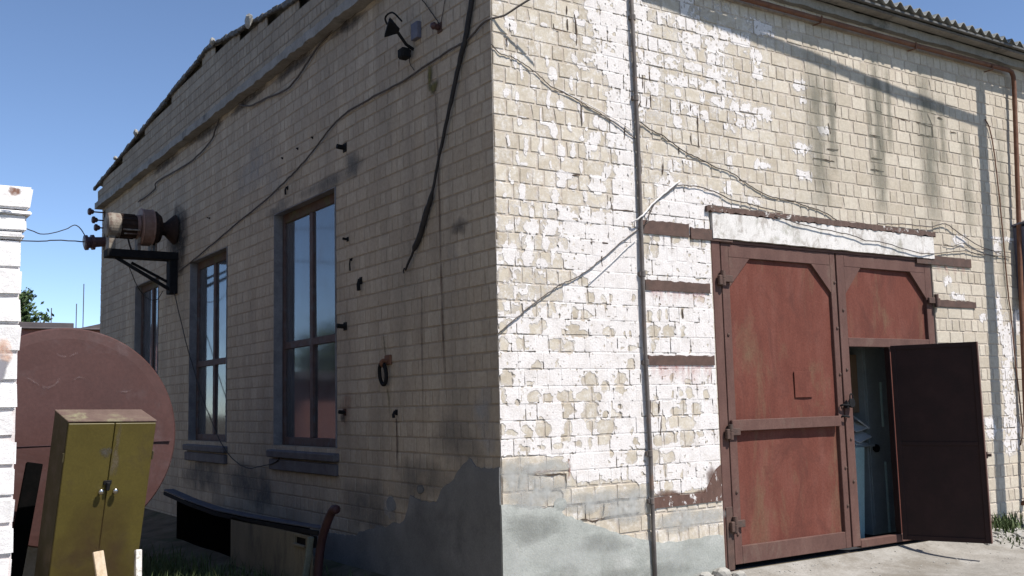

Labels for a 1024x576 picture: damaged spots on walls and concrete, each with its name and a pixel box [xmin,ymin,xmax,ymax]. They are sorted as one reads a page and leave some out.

leakage [814,94,834,161]
leakage [875,94,890,176]
peeling [985,236,1014,255]
peeling [313,0,774,576]
peeling [943,275,965,301]
peeling [979,292,1024,457]